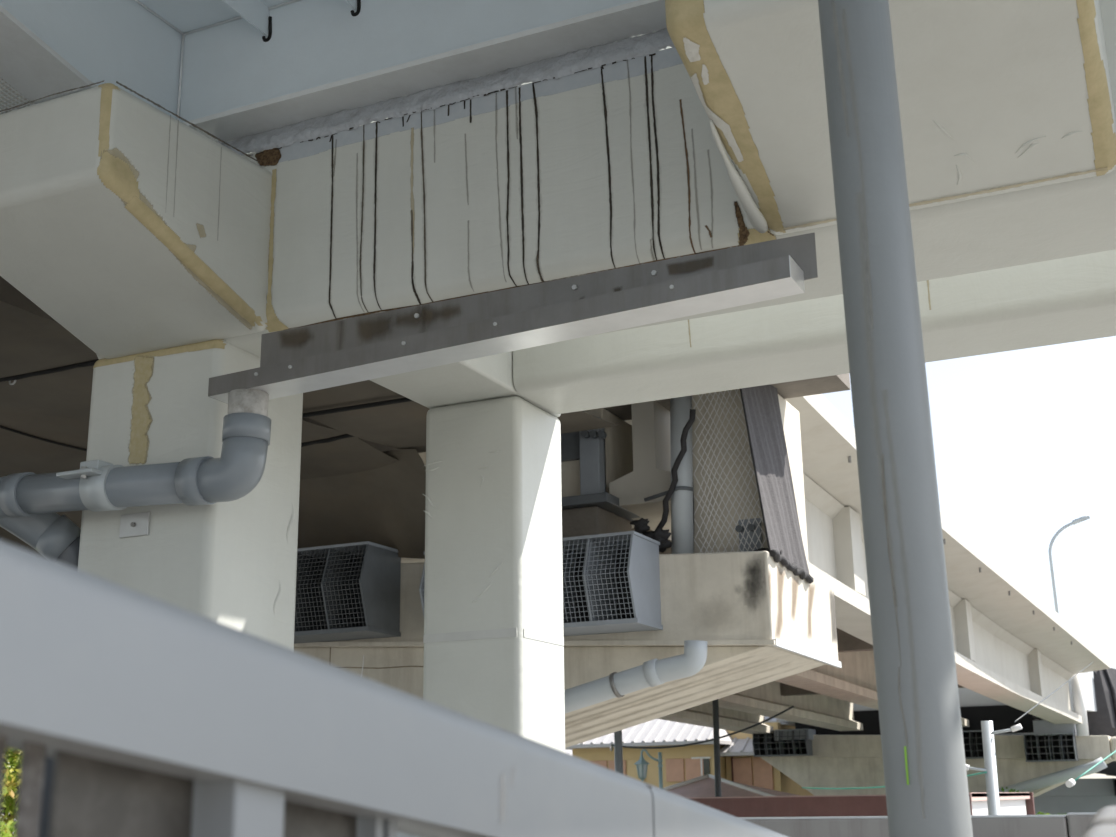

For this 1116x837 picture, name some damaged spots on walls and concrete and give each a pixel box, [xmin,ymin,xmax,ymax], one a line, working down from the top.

rust [255,148,281,166]
leakage [329,134,337,319]
leakage [360,121,383,313]
leakage [402,112,433,305]
peeling [0,0,837,332]
leakage [506,84,544,287]
leakage [601,66,615,268]
leakage [644,56,665,260]
leakage [679,99,696,253]
peeling [909,0,1116,207]
peeling [93,339,226,464]